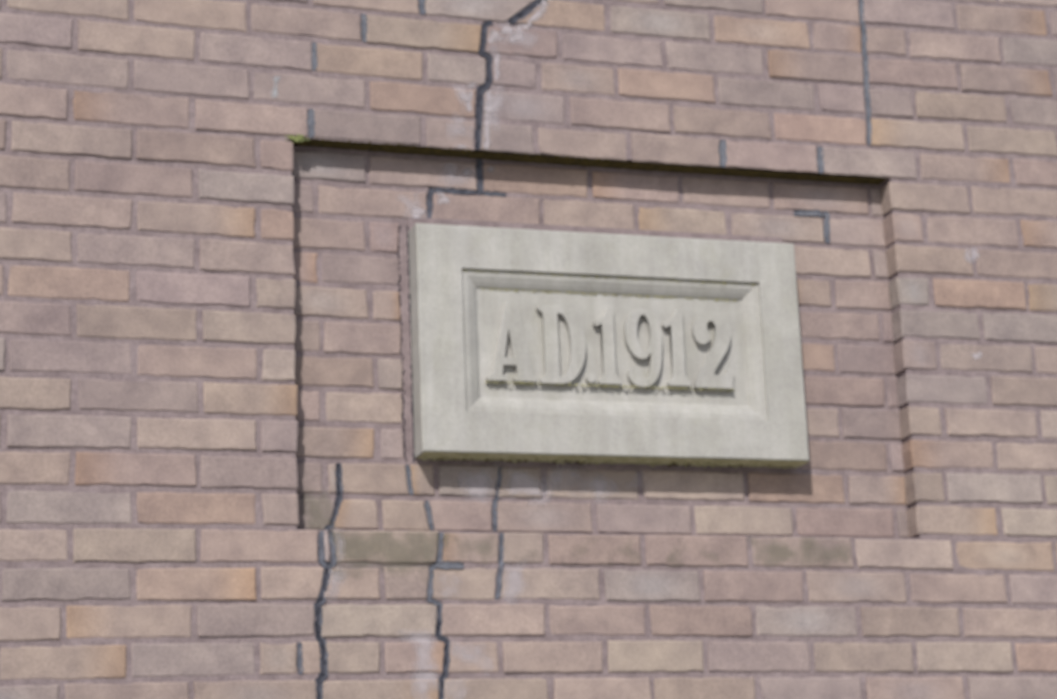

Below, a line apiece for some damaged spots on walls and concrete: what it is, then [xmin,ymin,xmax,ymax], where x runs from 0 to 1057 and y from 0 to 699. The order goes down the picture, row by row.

crack [306,109,316,138]
crack [310,42,318,71]
crack [360,14,369,42]
crack [858,0,872,145]
crack [397,0,549,699]
crack [296,463,343,699]